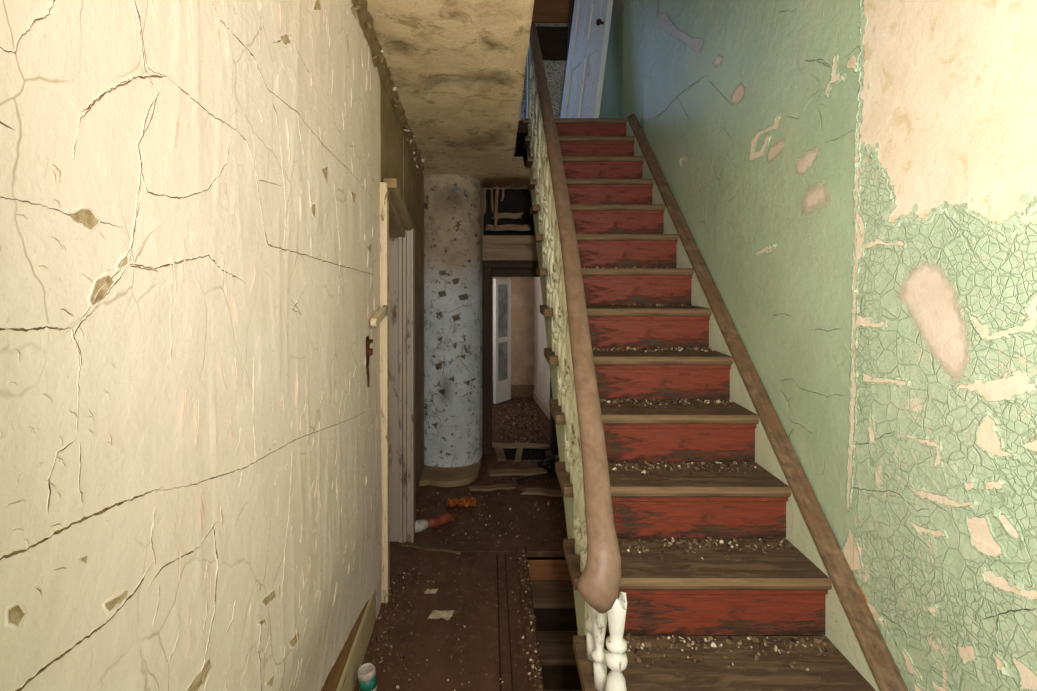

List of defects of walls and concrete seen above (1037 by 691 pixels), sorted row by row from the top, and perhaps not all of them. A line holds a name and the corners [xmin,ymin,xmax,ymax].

peeling [749,113,785,162]
spalling [55,199,107,243]
flaking render [803,184,826,212]
spalling [81,252,130,309]
peeling [824,0,1037,512]
crack [0,0,375,691]
crack [853,487,925,511]
peeling [905,475,1037,605]
spalling [4,600,27,630]
peeling [866,602,889,634]
crack [979,608,1037,653]
peeling [957,641,1037,691]